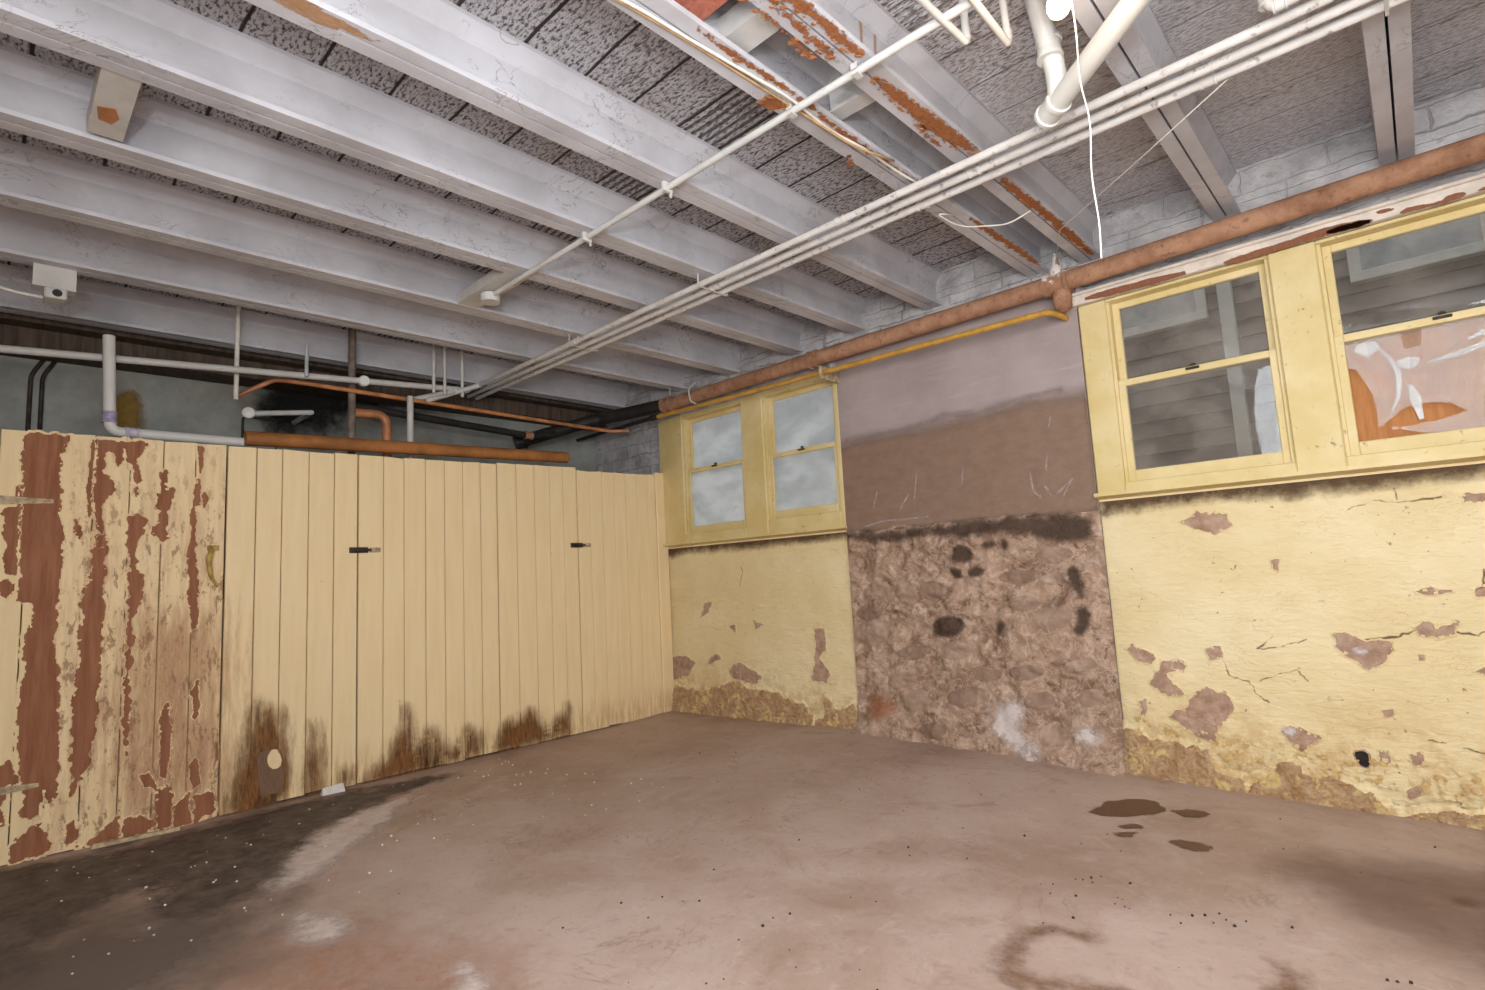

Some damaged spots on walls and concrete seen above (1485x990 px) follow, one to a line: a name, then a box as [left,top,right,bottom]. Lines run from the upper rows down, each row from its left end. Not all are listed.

corrosion [276,0,379,42]
corrosion [737,0,876,60]
corrosion [697,26,918,183]
corrosion [870,76,979,154]
spalling [1458,490,1485,507]
peeling [0,430,220,866]
spalling [672,510,1485,830]
crack [1227,639,1308,703]
crack [1361,630,1415,642]
damp [0,705,571,990]
damp [1090,799,1209,837]
damp [1169,839,1213,851]